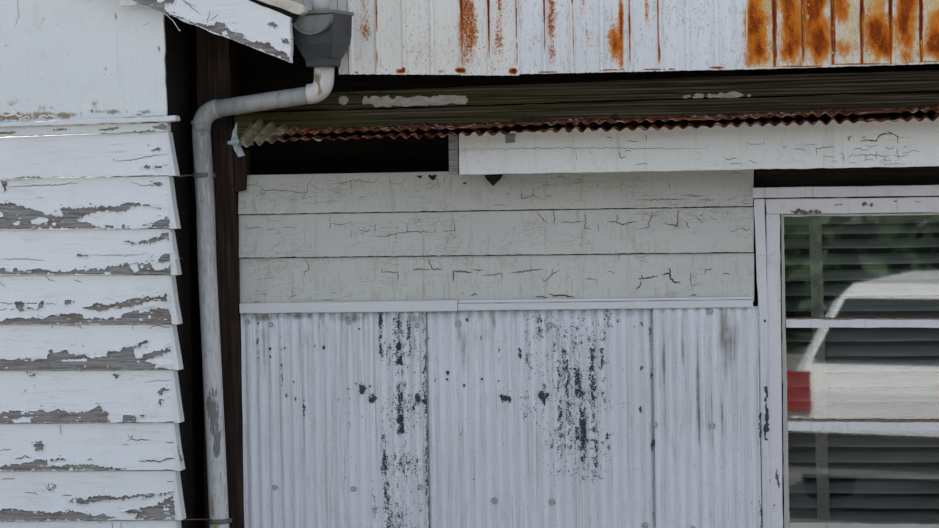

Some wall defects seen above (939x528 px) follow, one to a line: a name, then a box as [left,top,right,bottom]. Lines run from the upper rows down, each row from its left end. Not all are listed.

rust [393,0,558,74]
rust [571,0,631,71]
rust [644,0,676,70]
rust [743,0,939,67]
crack [799,131,920,165]
peeling [0,176,177,275]
crack [499,184,750,232]
crack [382,260,574,299]
crack [636,268,729,296]
peeling [0,290,173,324]
peeling [0,339,173,381]
peeling [0,489,176,521]